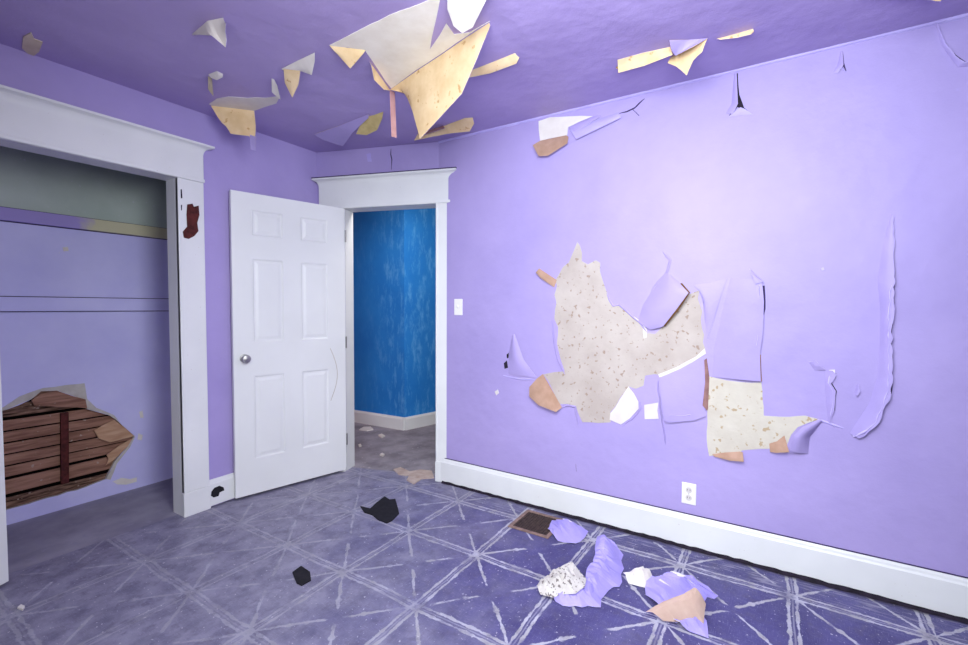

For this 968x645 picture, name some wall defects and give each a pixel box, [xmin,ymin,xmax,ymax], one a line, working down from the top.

peeling [282,53,315,75]
flaking render [330,0,490,88]
flaking render [539,116,592,141]
crack [726,73,753,117]
crack [936,24,968,67]
flaking render [544,242,705,423]
spalling [2,383,143,510]
flaking render [707,376,817,456]